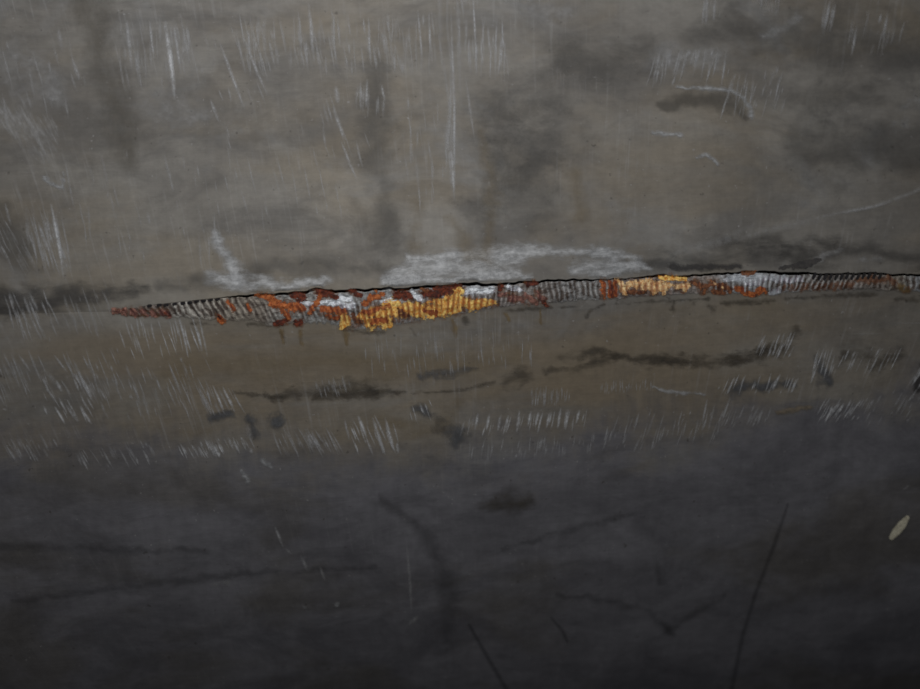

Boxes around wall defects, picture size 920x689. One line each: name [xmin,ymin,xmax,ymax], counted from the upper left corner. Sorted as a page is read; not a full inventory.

leakage [0,286,145,314]
rust [110,307,172,319]
leakage [210,232,328,291]
rust [246,280,549,345]
crack [147,258,920,307]
leakage [382,244,741,285]
rust [599,270,768,299]